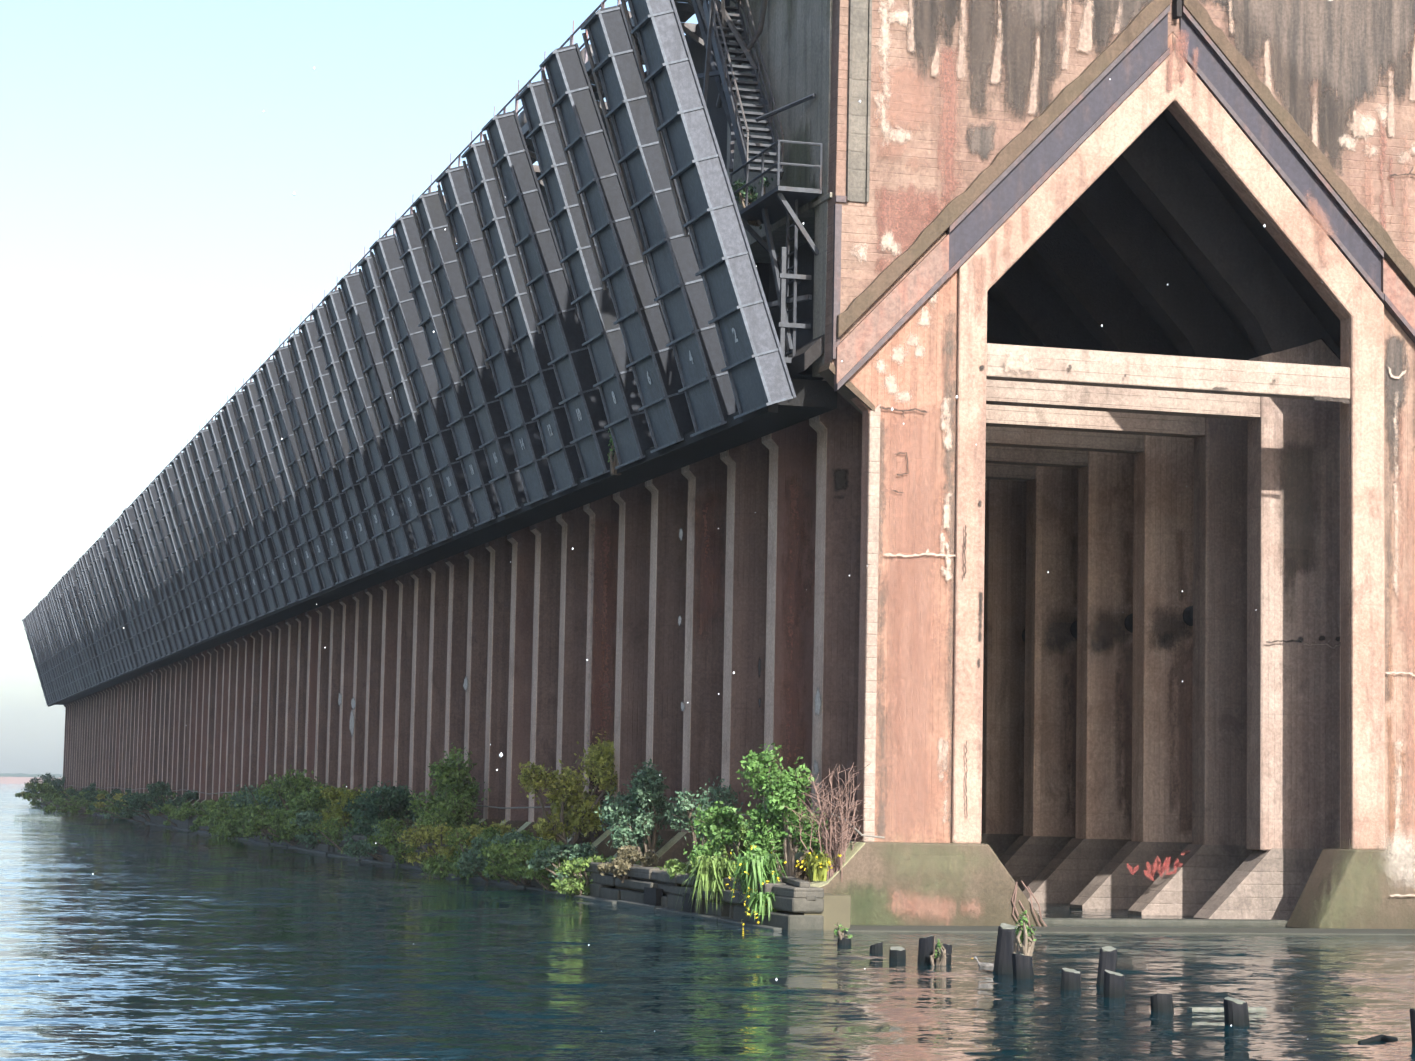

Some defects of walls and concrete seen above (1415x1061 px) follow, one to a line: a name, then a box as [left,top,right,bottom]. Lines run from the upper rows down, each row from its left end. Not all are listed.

peeling [875,0,914,143]
peeling [931,46,940,76]
peeling [957,0,966,78]
peeling [991,1,1002,84]
water stain [908,0,1152,160]
peeling [1028,37,1040,114]
peeling [1061,0,1093,69]
peeling [1264,41,1272,93]
water stain [1202,0,1415,173]
peeling [1339,46,1415,156]
peeling [881,232,901,254]
water stain [1282,445,1314,590]